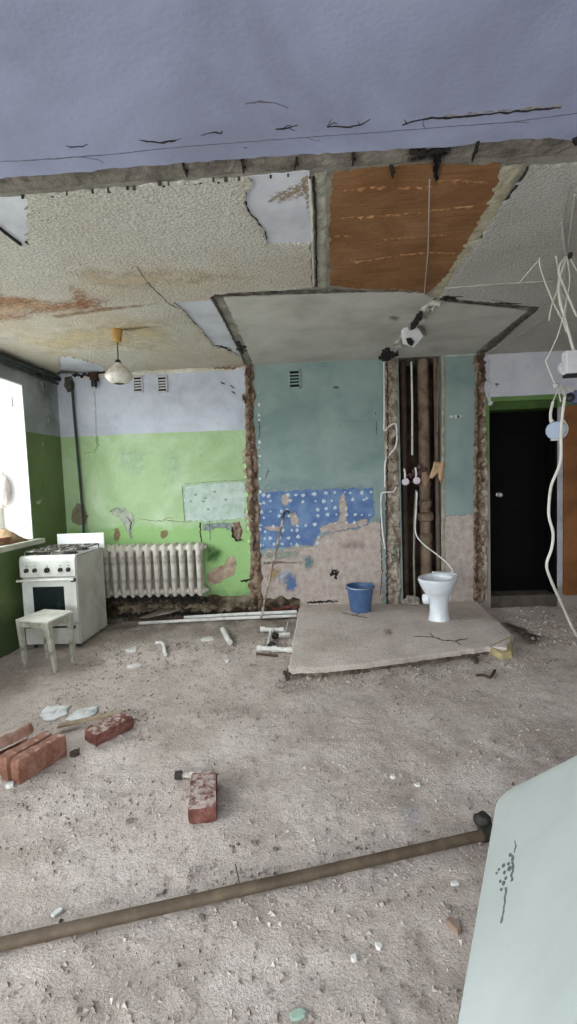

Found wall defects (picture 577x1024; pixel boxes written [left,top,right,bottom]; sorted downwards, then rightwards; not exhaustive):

peeling [0,195,31,244]
peeling [184,170,311,246]
crack [0,100,577,246]
crack [137,267,232,351]
peeling [130,298,247,375]
peeling [71,503,88,525]
flaking render [106,440,385,618]
crack [414,633,468,645]